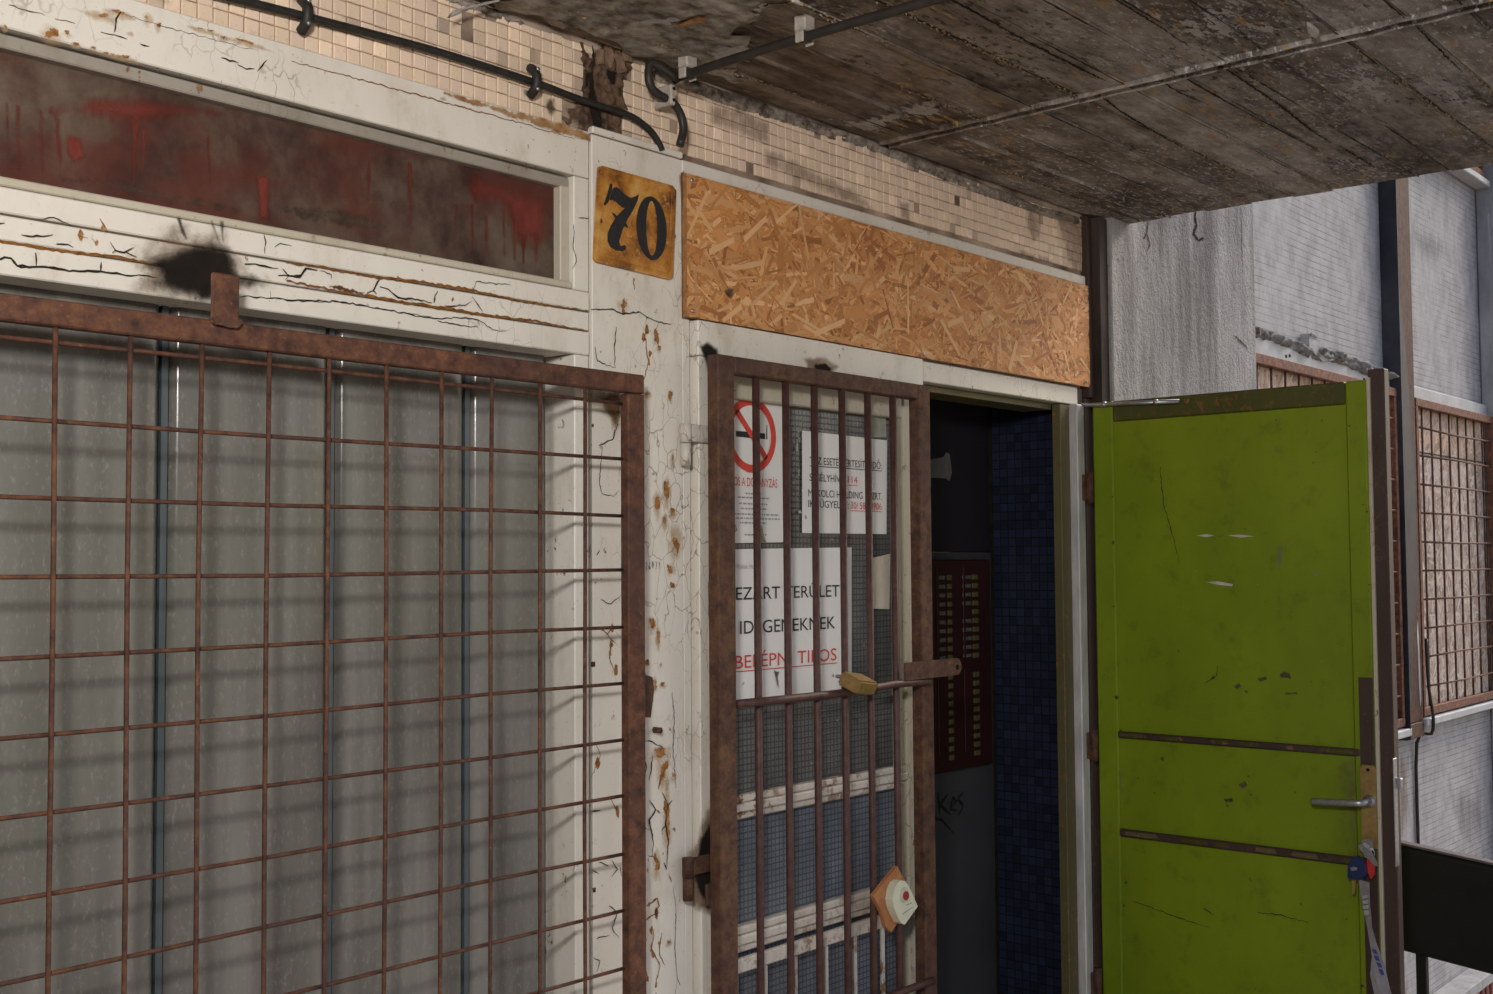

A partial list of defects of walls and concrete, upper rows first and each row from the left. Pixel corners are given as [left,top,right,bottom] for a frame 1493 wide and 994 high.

crack [8,4,574,139]
spalling [446,0,1080,224]
crack [0,217,157,278]
crack [241,235,509,331]
crack [591,278,671,379]
crack [599,424,618,497]
corrosion [655,481,680,588]
corrosion [654,748,676,780]